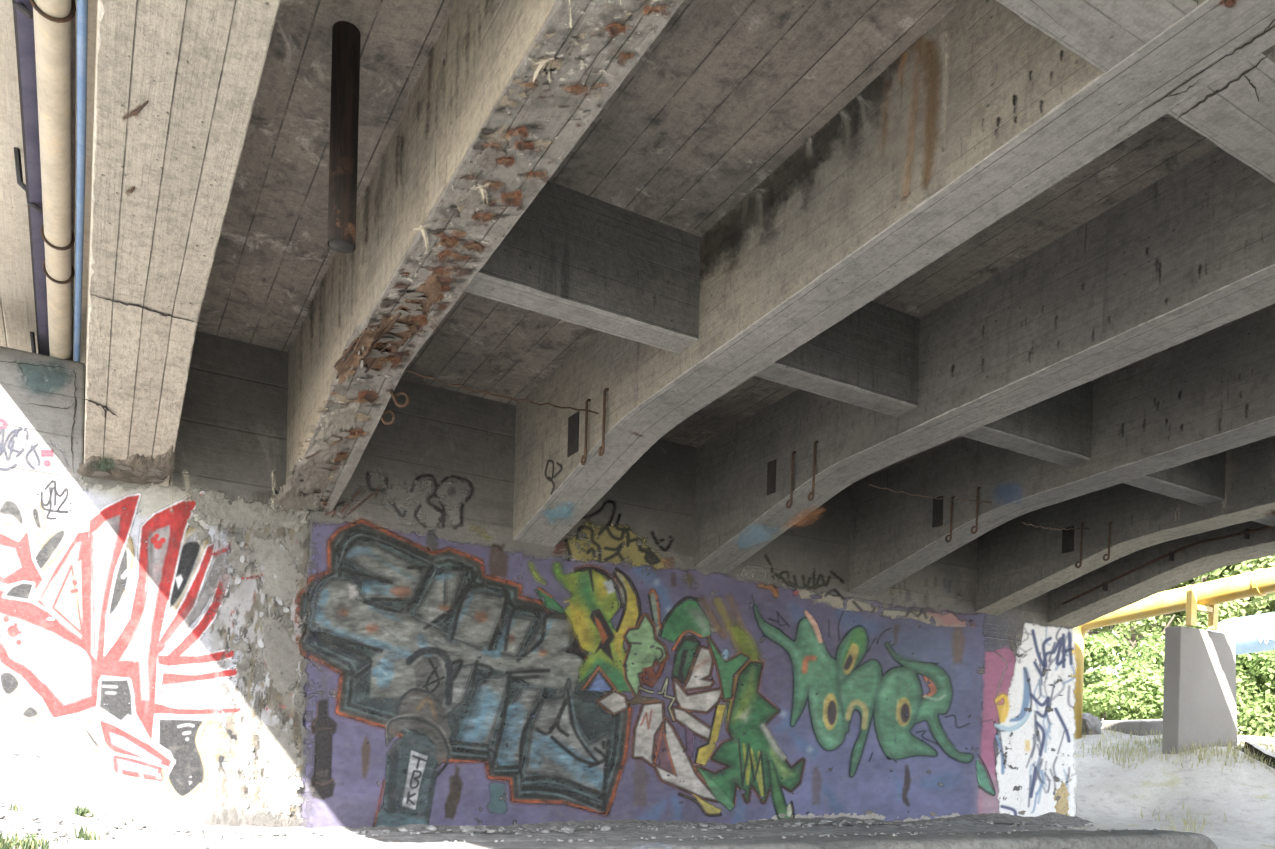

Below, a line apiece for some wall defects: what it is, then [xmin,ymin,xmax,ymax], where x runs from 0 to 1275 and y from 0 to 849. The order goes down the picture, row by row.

crack [1119,19,1275,128]
crack [90,294,197,323]
peeling [184,0,670,698]
spalling [77,445,175,485]
peeling [242,720,306,827]